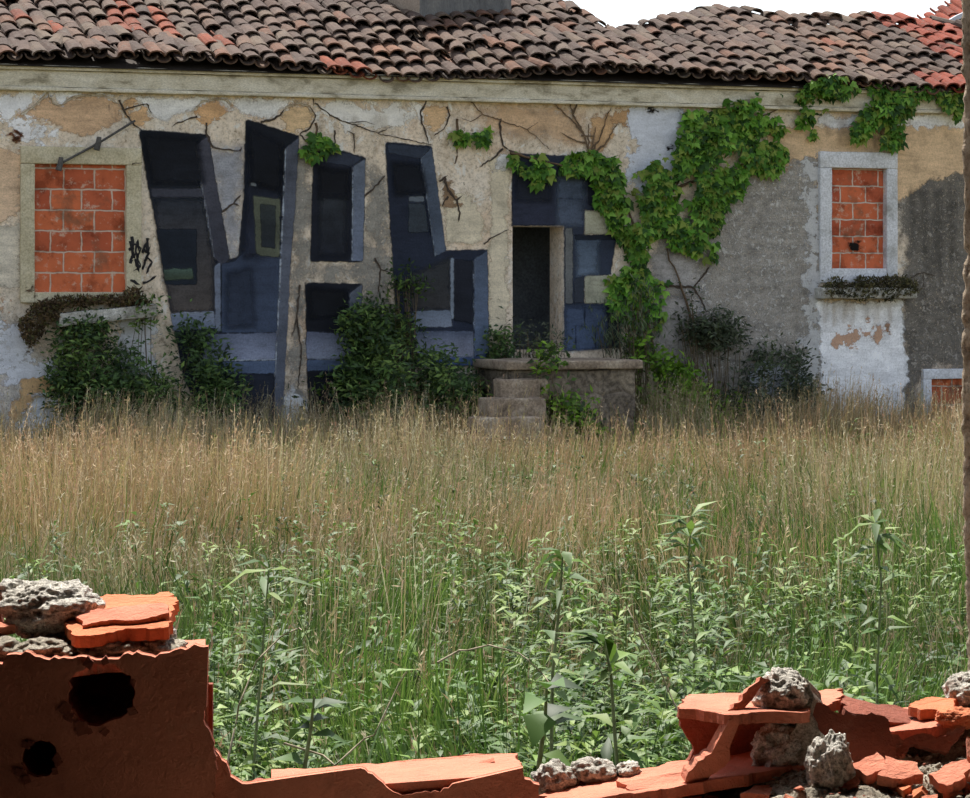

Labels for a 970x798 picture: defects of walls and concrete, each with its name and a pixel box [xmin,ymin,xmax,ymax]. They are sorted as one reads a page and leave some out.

crack [118,99,152,130]
crack [172,116,242,152]
crack [261,110,284,123]
crack [299,98,451,152]
crack [480,118,515,167]
crack [439,176,463,222]
peeling [652,113,965,423]
water stain [898,171,968,424]